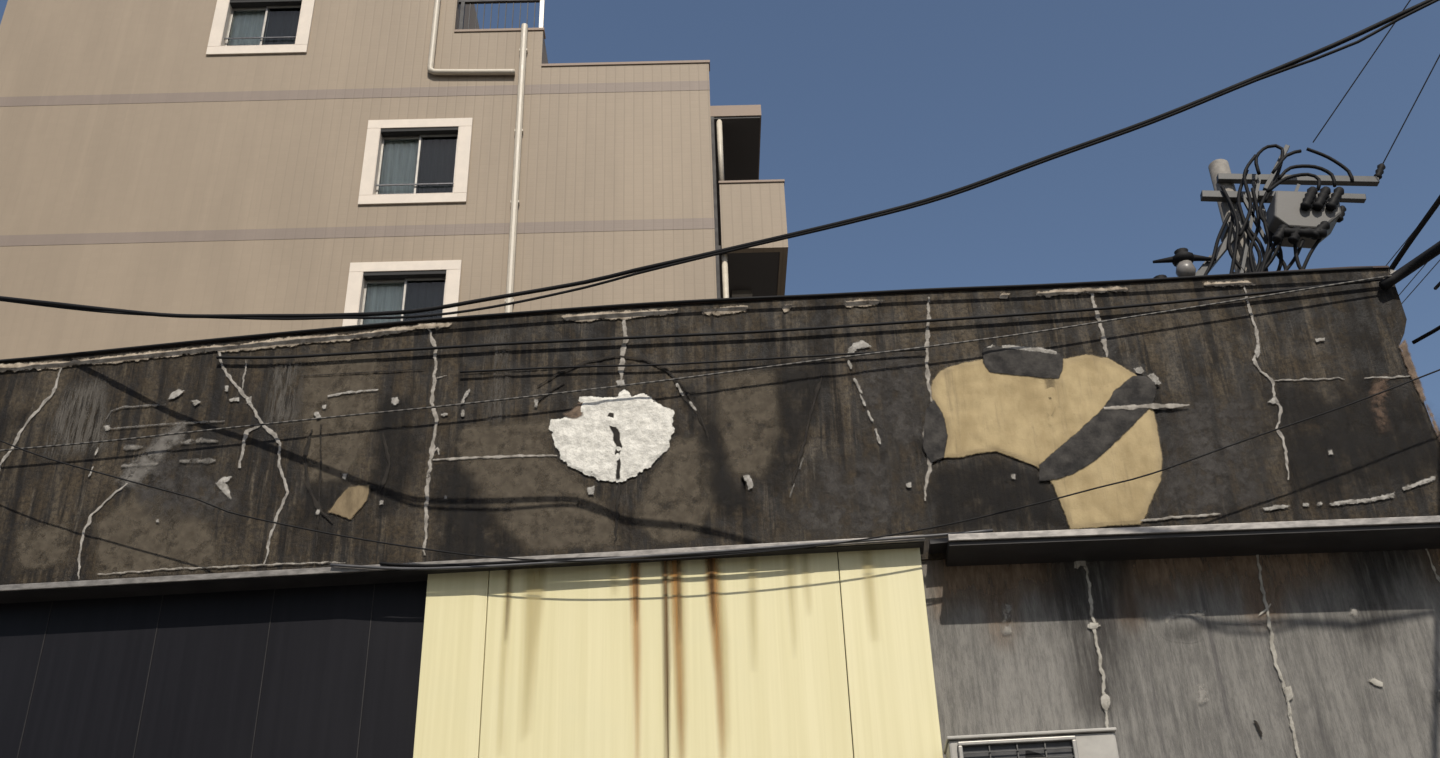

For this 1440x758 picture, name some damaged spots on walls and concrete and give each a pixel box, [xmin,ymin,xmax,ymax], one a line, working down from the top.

peeling [987,344,1057,354]
peeling [1134,367,1161,385]
crack [1243,286,1411,480]
crack [215,352,289,564]
water stain [437,466,519,560]
crack [422,328,557,555]
peeling [608,412,622,479]
water stain [937,462,1061,527]
water stain [1283,389,1437,488]
corrosion [662,560,679,720]
corrosion [707,558,718,663]
crack [1074,561,1110,728]